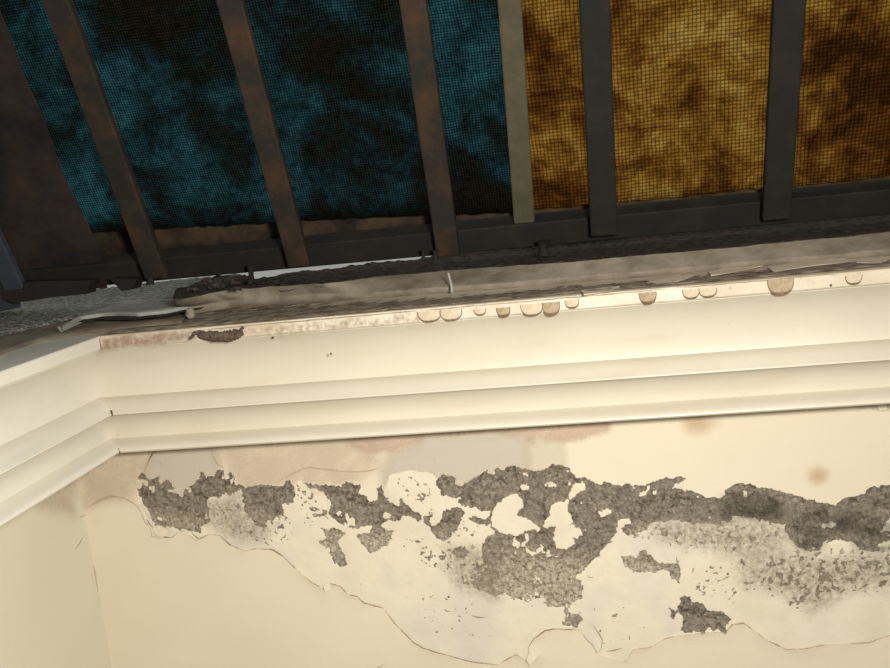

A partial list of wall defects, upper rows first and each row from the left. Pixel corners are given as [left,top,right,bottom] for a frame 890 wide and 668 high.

peeling [110,464,890,665]